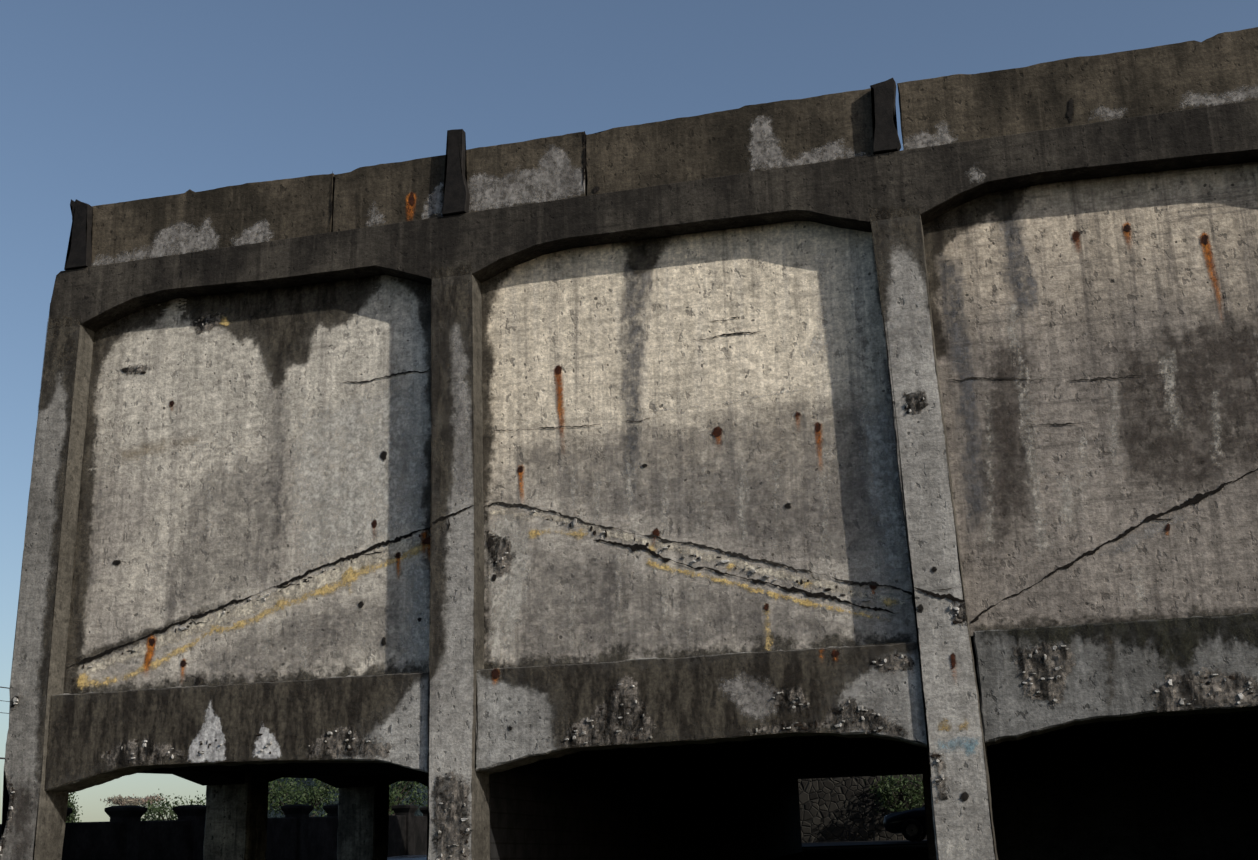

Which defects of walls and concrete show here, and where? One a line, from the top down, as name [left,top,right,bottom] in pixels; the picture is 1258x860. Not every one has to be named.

damp [749,116,856,170]
damp [468,147,585,211]
corrosion [1201,233,1219,292]
corrosion [555,365,564,425]
damp [869,187,1041,537]
crack [950,373,1171,381]
damp [11,236,918,860]
crack [66,468,1258,674]
corrosion [145,636,156,667]
peeling [100,702,226,767]
spalling [560,675,657,748]
spalling [431,770,472,860]